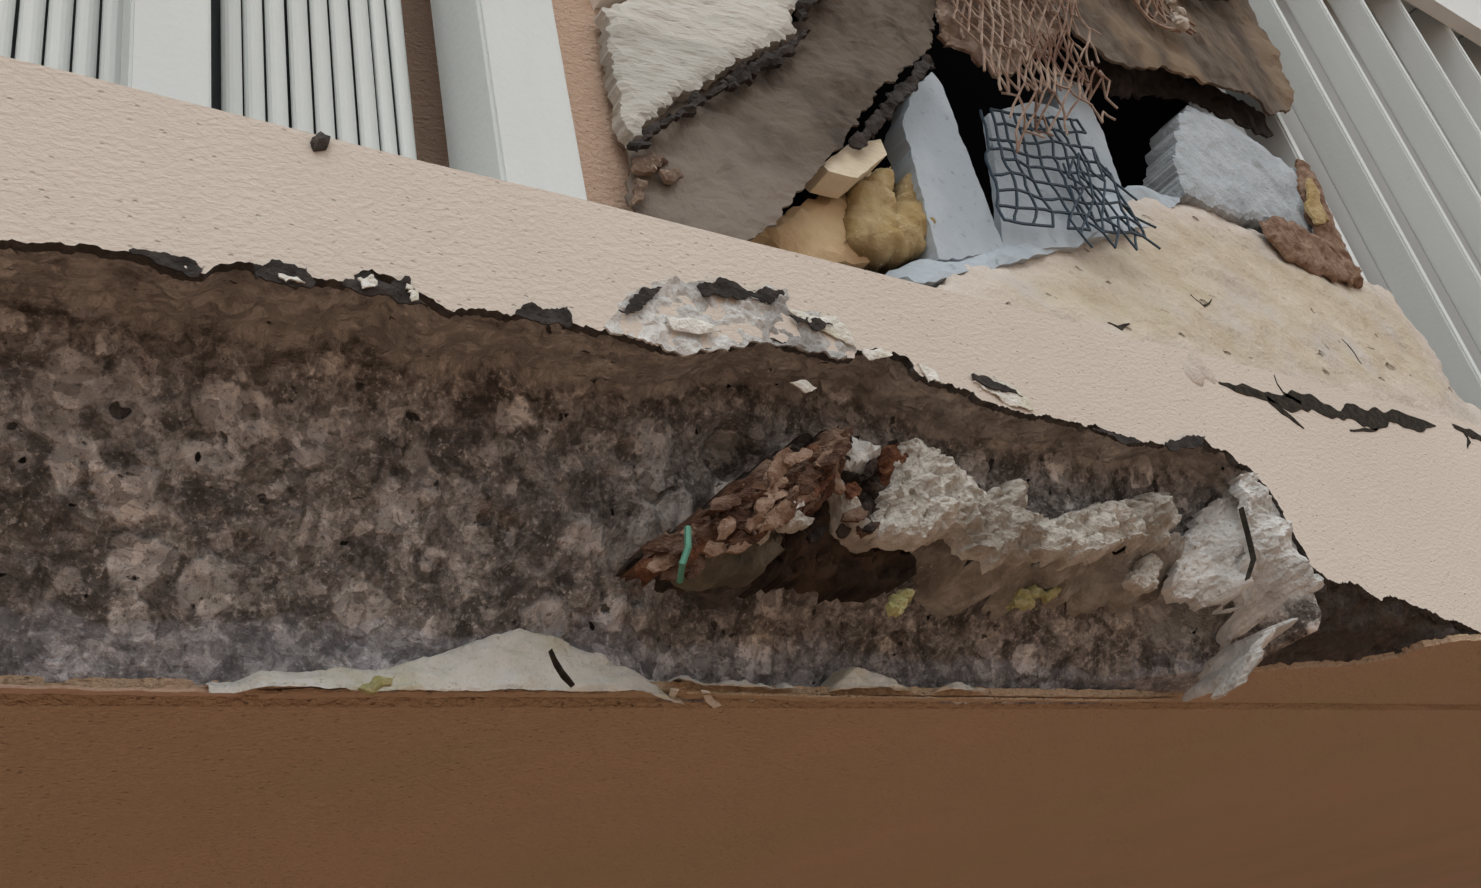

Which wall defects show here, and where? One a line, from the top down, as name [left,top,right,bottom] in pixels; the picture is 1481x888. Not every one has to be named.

peeling [594,0,937,241]
peeling [1054,0,1294,139]
spalling [0,248,1476,708]
crack [1219,371,1481,449]